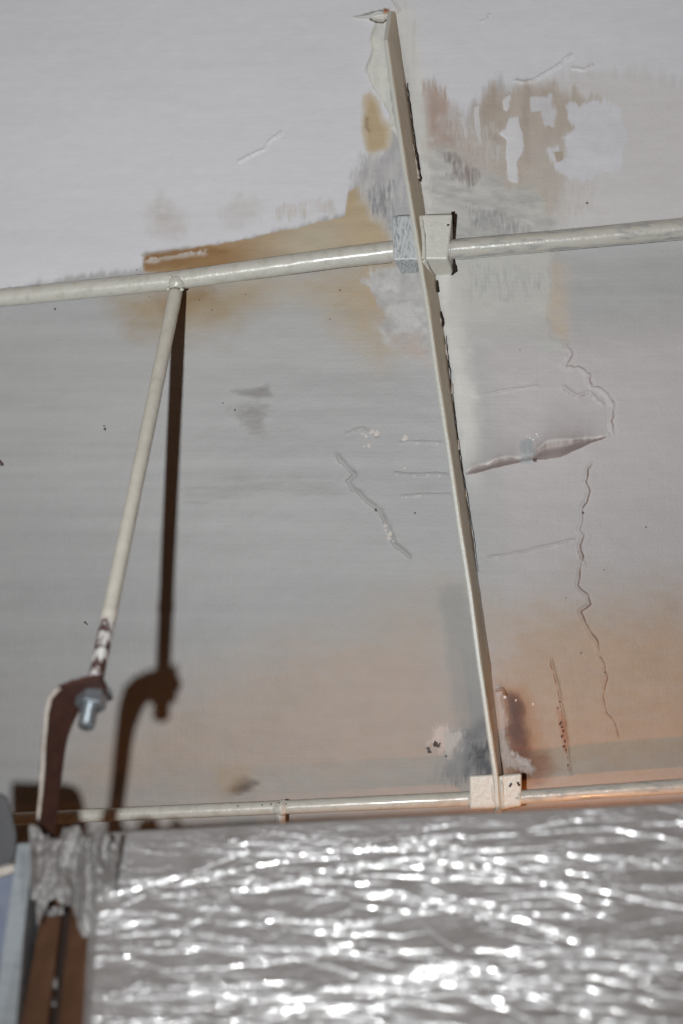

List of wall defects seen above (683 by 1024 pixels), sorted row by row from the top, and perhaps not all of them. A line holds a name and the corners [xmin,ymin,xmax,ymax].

flaking render [350,6,398,139]
peeling [411,69,614,229]
leakage [217,261,418,393]
leakage [15,825,29,843]
leakage [10,703,47,812]
leakage [58,552,465,810]
leakage [55,806,524,839]
leakage [476,561,505,671]
corrosion [492,669,569,790]
crack [573,459,622,739]